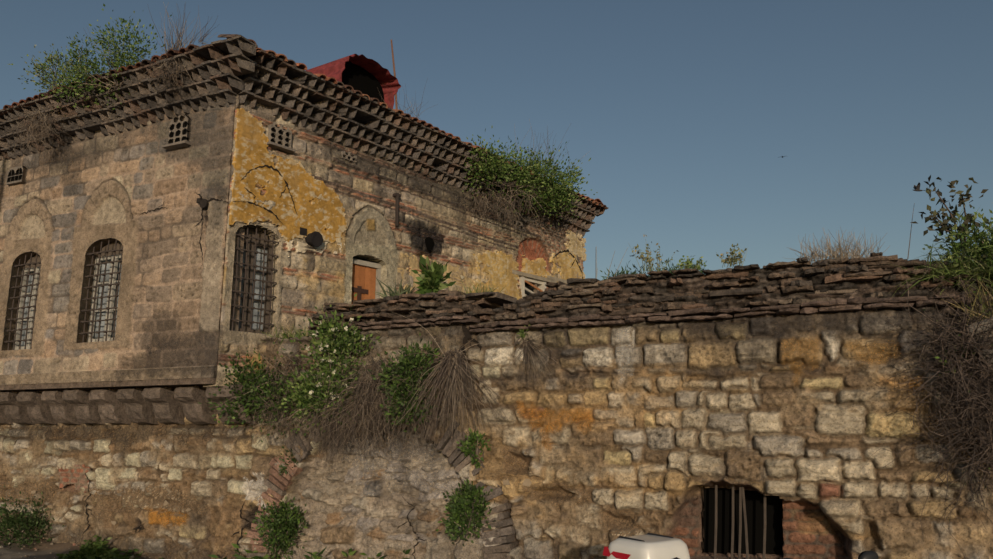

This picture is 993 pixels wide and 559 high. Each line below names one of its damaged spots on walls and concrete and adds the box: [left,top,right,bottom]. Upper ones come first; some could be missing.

crack [194,165,297,265]
peeling [229,108,347,257]
peeling [397,230,586,300]